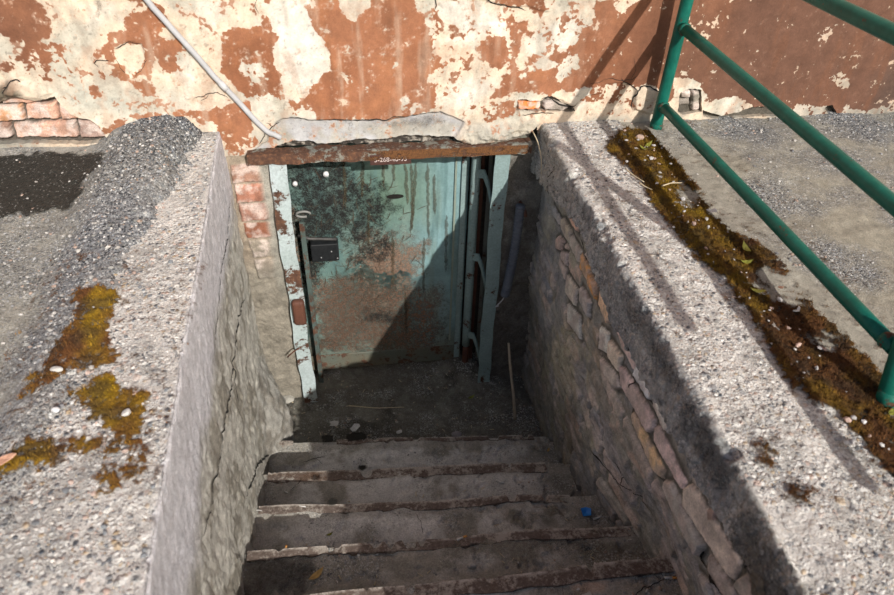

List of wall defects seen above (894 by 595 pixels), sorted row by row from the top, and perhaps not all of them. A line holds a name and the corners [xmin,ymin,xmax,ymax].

peeling [689,4,729,39]
peeling [0,0,664,156]
crack [591,58,658,110]
peeling [668,49,777,120]
crack [699,106,773,116]
peeling [786,66,894,116]
peeling [830,43,860,89]
rust [367,145,528,161]